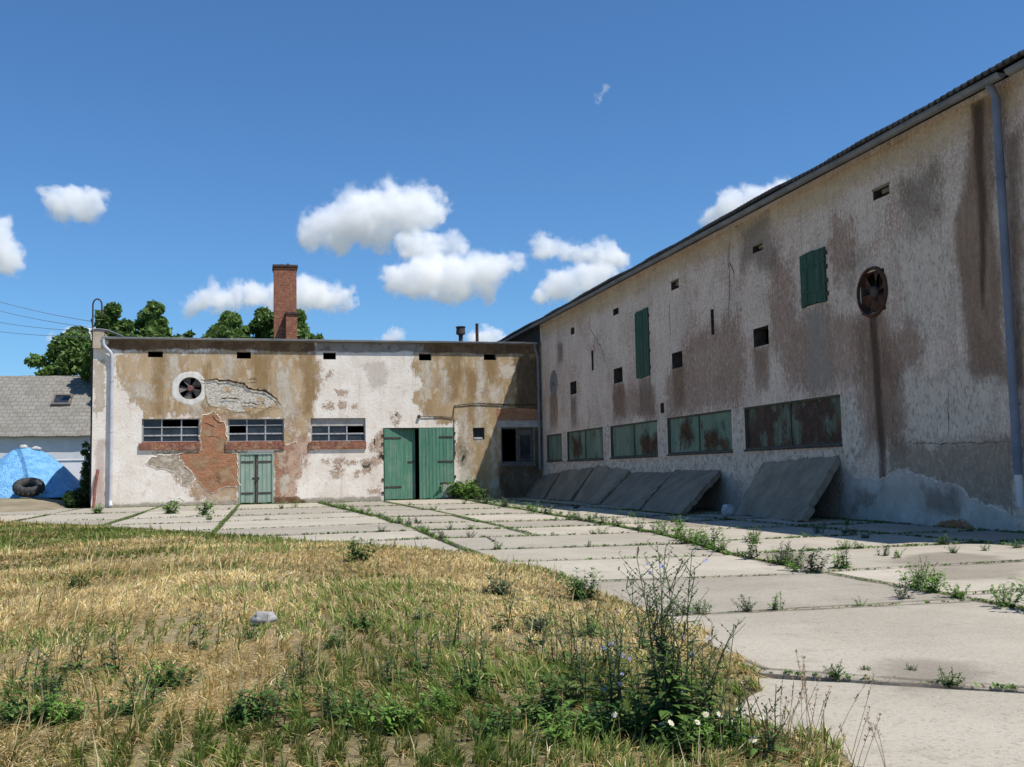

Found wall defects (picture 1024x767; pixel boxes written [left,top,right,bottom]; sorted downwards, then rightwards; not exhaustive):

damp [957,102,1024,384]
peeling [93,348,401,504]
damp [108,340,543,498]
corrosion [680,421,729,451]
damp [889,435,1013,510]